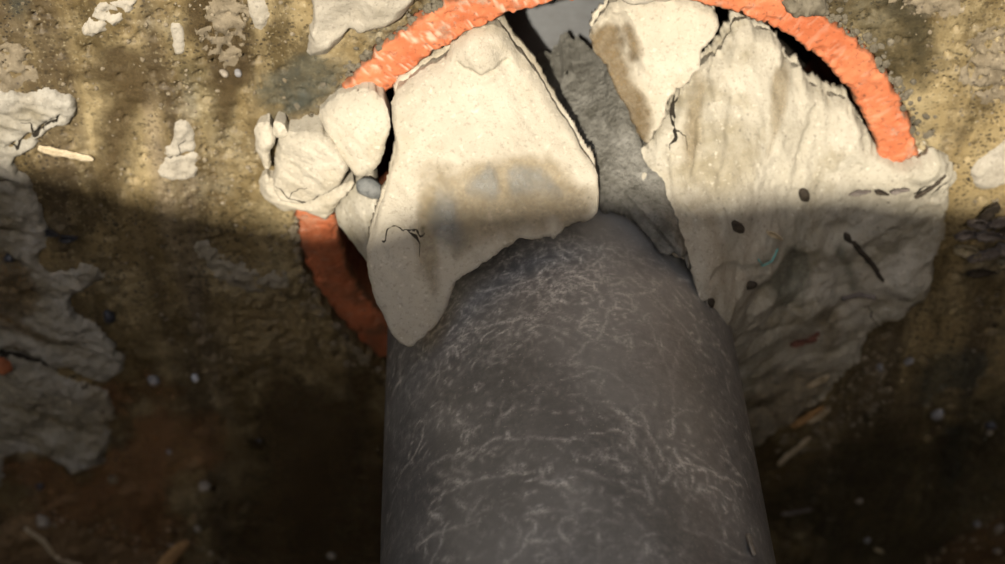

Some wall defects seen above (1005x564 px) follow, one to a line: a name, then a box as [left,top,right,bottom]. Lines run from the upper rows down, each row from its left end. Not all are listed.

spalling [888,0,967,20]
crack [10,115,59,150]
crack [669,95,688,150]
crack [382,225,425,257]
crack [0,349,89,389]